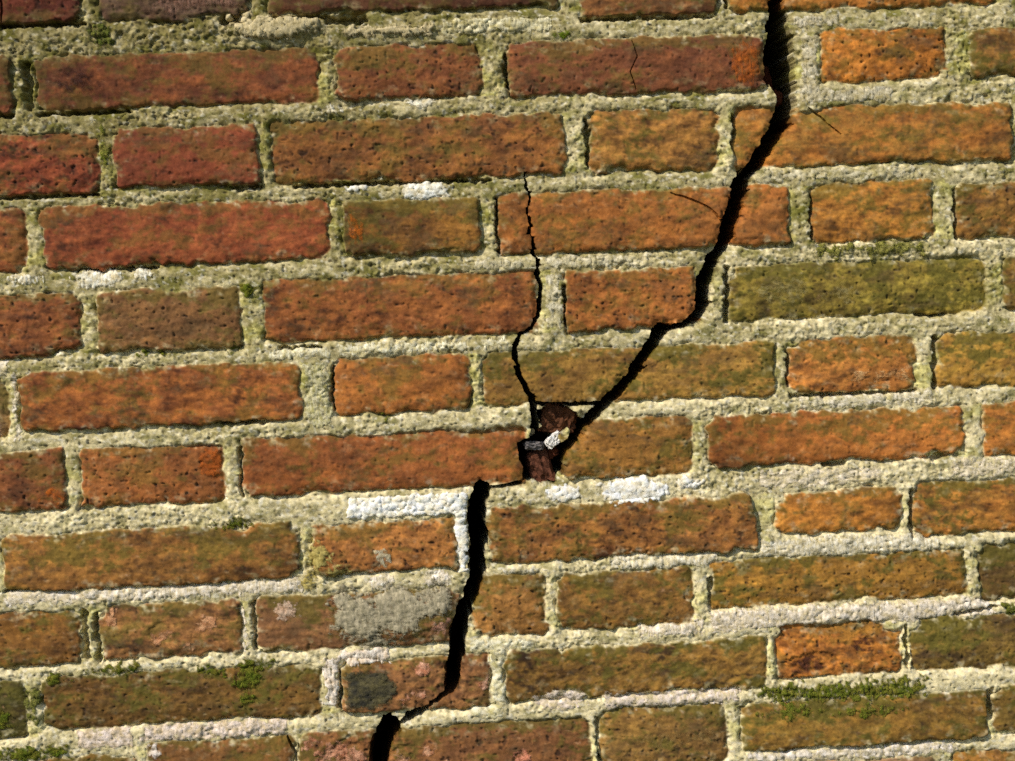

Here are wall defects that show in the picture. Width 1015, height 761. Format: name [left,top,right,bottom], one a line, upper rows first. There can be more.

crack [369,0,842,761]
damp [545,483,580,502]
damp [595,474,705,506]
damp [346,492,469,587]
damp [369,573,394,591]